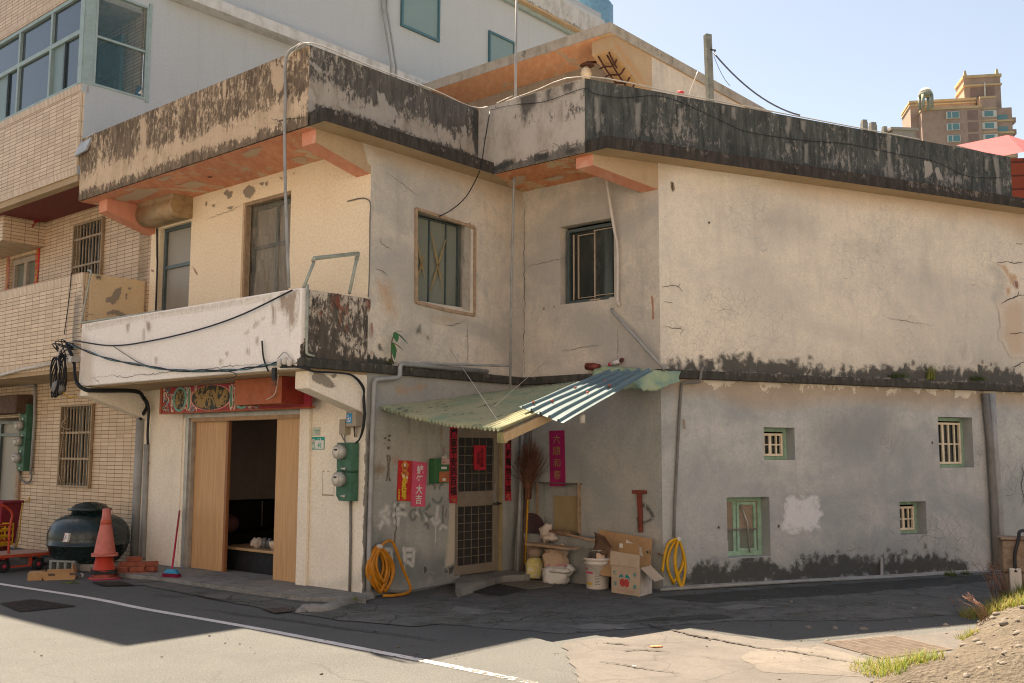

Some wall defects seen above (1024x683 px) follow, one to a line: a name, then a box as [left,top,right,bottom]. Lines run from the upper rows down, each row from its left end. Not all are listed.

peeling [205,156,307,210]
water stain [534,152,549,163]
water stain [516,80,578,129]
water stain [593,95,601,133]
water stain [633,101,642,138]
water stain [785,117,809,165]
water stain [883,134,894,178]
water stain [984,156,1002,195]
peeling [105,282,132,316]
water stain [606,245,1024,464]
water stain [663,529,998,588]